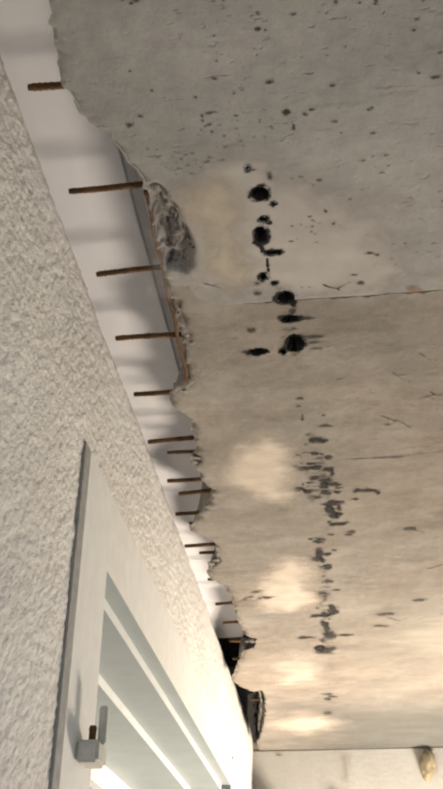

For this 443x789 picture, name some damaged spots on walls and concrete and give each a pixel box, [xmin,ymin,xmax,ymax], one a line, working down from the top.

spalling [68,181,195,411]
spalling [147,424,222,581]
spalling [215,596,263,606]
spalling [223,617,257,677]
spalling [247,691,267,743]